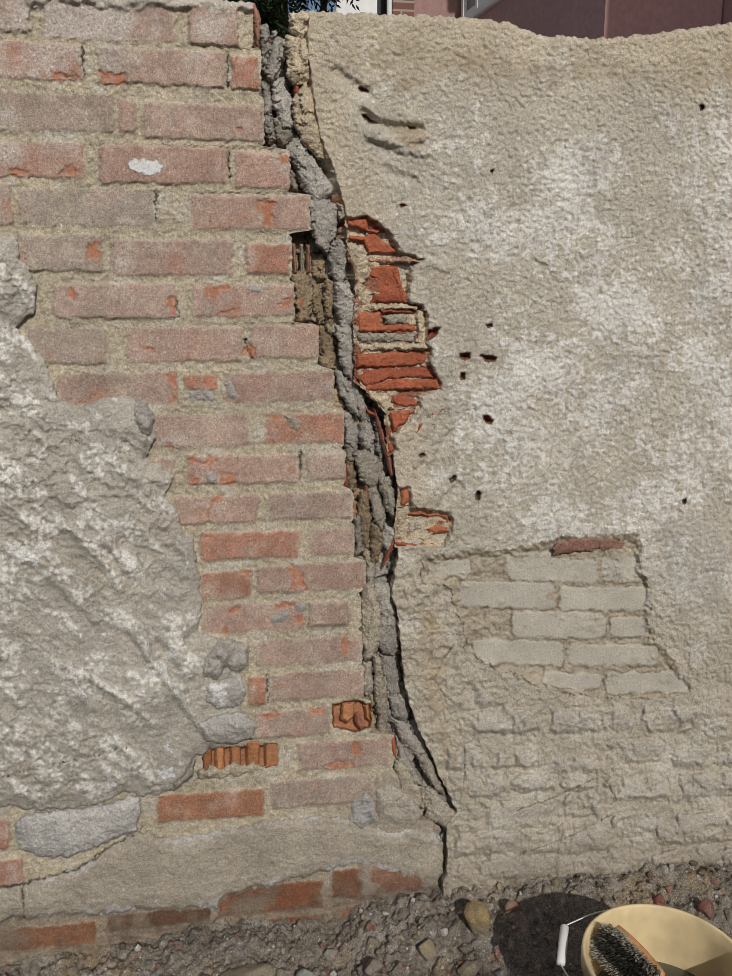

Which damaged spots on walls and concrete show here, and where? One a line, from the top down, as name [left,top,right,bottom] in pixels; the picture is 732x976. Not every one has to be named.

spalling [50,70,81,83]
spalling [97,68,128,87]
spalling [253,198,277,229]
spalling [204,282,230,300]
spalling [344,216,442,456]
crack [252,3,466,885]
spalling [187,455,236,518]
spalling [274,564,307,627]
peeling [394,487,693,700]
spalling [202,741,279,770]
spalling [308,700,372,771]
crack [2,826,143,920]